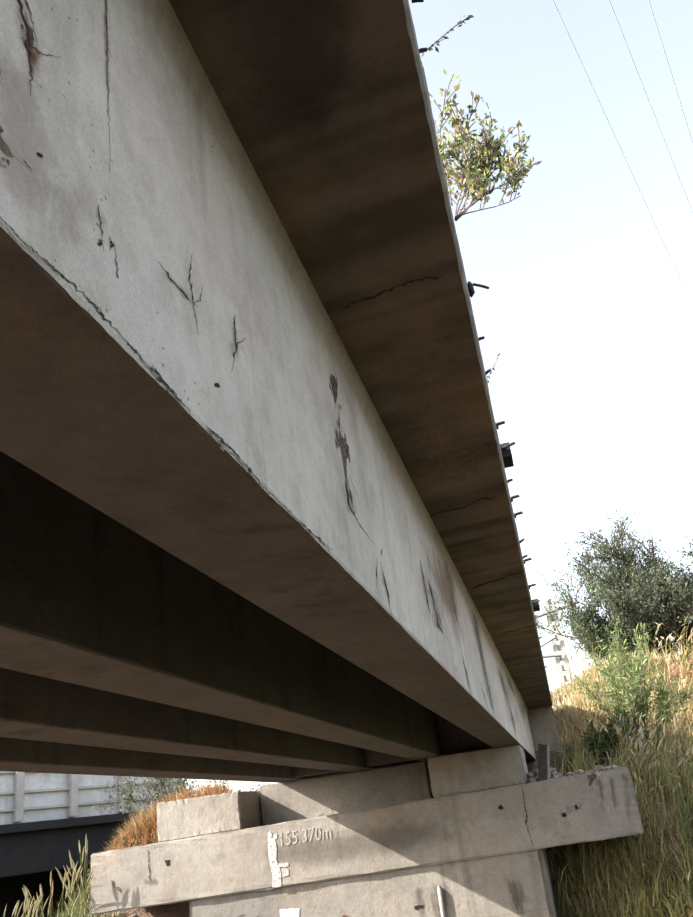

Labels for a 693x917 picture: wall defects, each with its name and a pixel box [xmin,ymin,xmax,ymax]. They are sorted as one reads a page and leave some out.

crack [18,0,62,96]
crack [103,0,111,142]
spalling [0,126,33,172]
crack [98,205,119,278]
crack [344,276,443,309]
crack [0,217,330,549]